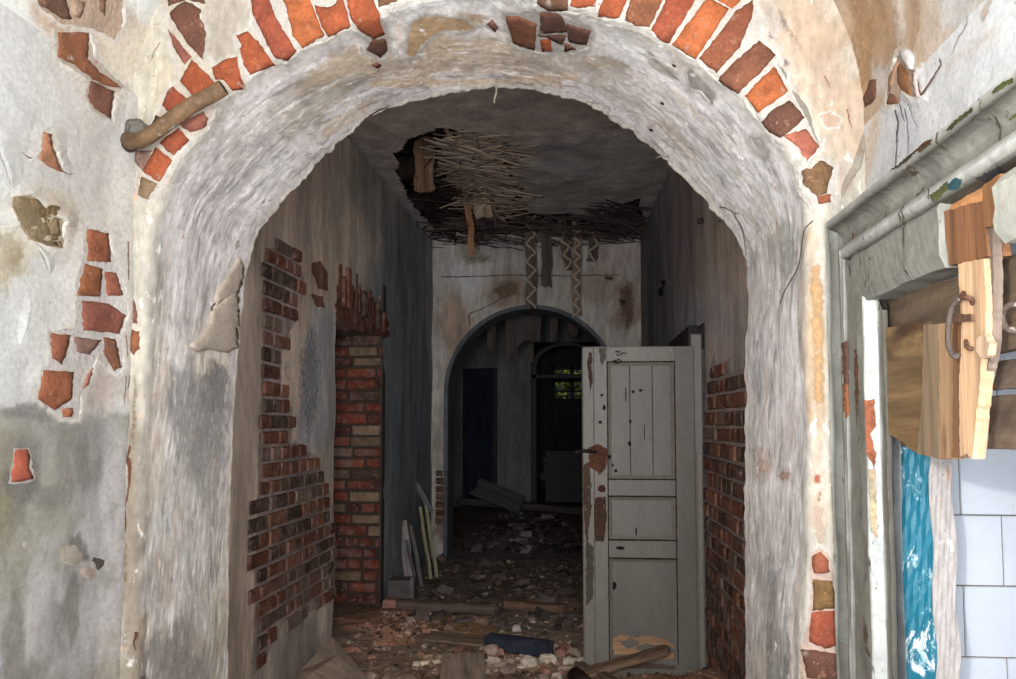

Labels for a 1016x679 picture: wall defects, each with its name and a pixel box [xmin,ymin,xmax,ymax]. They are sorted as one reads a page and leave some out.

spalling [22,0,138,132]
spalling [133,0,865,220]
spalling [863,39,941,116]
spalling [0,112,140,431]
peeling [190,240,245,353]
spalling [8,448,35,485]
water stain [6,404,50,422]
water stain [73,535,88,561]
spalling [247,238,390,678]
spalling [702,348,758,679]
spalling [779,538,837,679]